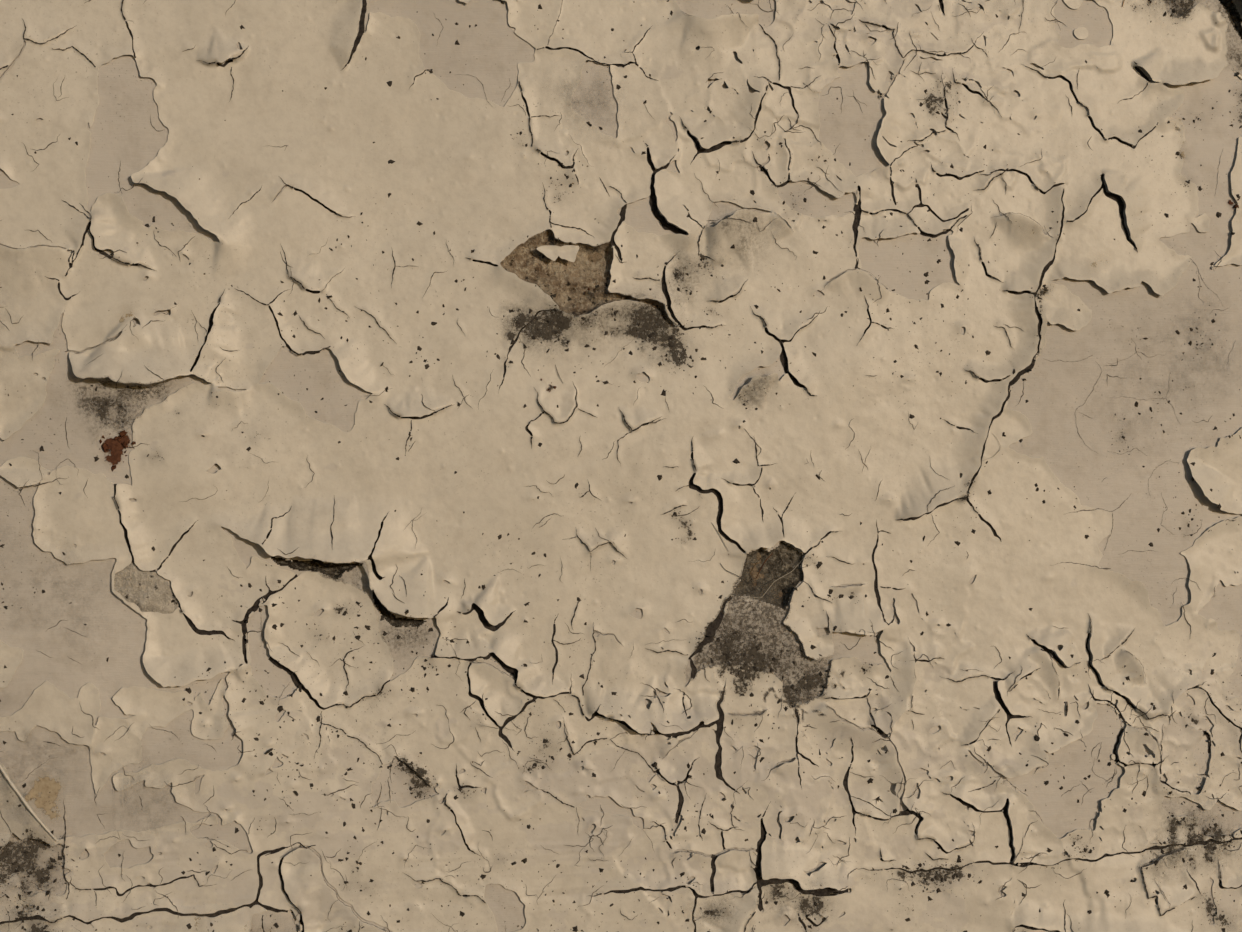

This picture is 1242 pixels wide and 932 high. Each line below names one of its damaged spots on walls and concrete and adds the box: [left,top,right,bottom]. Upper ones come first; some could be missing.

crack [458,74,588,185]
crack [1118,49,1168,103]
crack [0,163,195,361]
peeling [536,245,579,262]
crack [542,179,628,263]
crack [634,0,1158,542]
crack [367,309,669,464]
corrosion [99,430,136,471]
crack [114,483,198,572]
crack [260,487,299,555]
crack [661,431,852,632]
peeling [675,518,906,716]